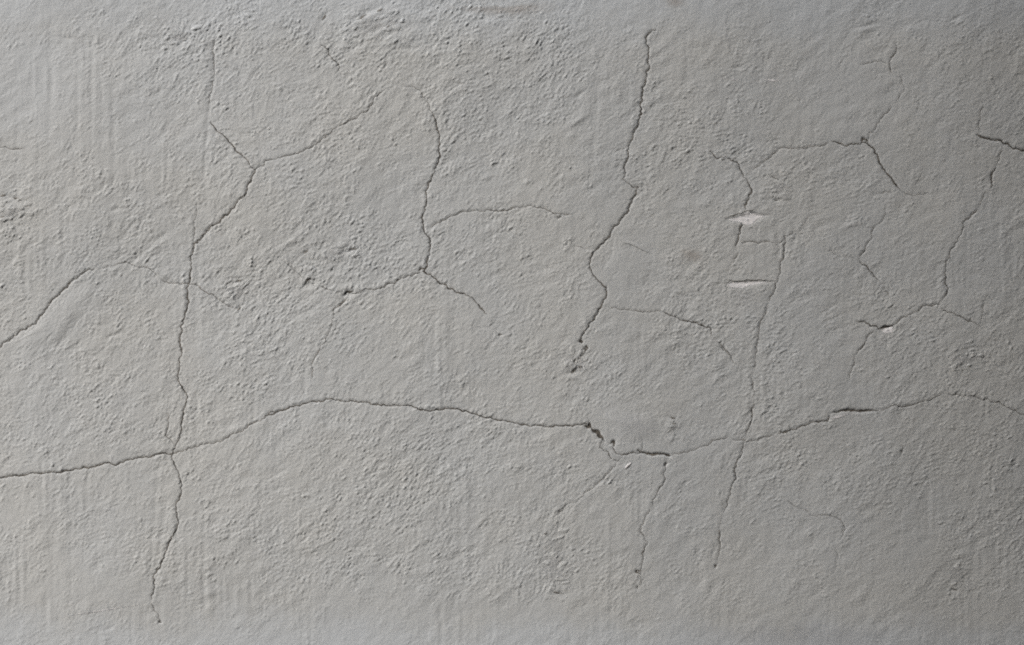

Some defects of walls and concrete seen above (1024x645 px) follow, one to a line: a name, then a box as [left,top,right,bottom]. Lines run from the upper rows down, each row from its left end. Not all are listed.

crack [0,86,942,623]
crack [574,30,736,365]
spalling [729,209,763,225]
spalling [727,279,772,288]
crack [710,43,918,209]
crack [849,104,1024,379]